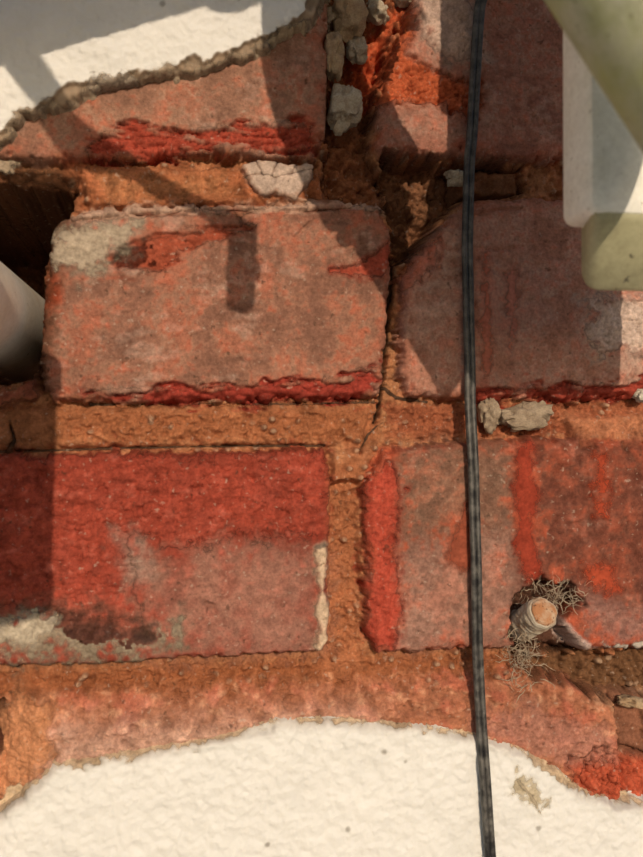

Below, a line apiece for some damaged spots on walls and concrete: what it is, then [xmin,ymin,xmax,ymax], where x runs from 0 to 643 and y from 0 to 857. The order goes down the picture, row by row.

spalling [369,0,474,118]
spalling [0,4,335,299]
crack [89,400,114,408]
spalling [87,366,383,410]
crack [253,260,428,450]
spalling [476,376,643,407]
water stain [585,291,643,360]
spalling [0,445,333,622]
spalling [356,461,409,651]
water stain [0,608,184,667]
spalling [0,691,247,812]
spalling [510,742,643,805]